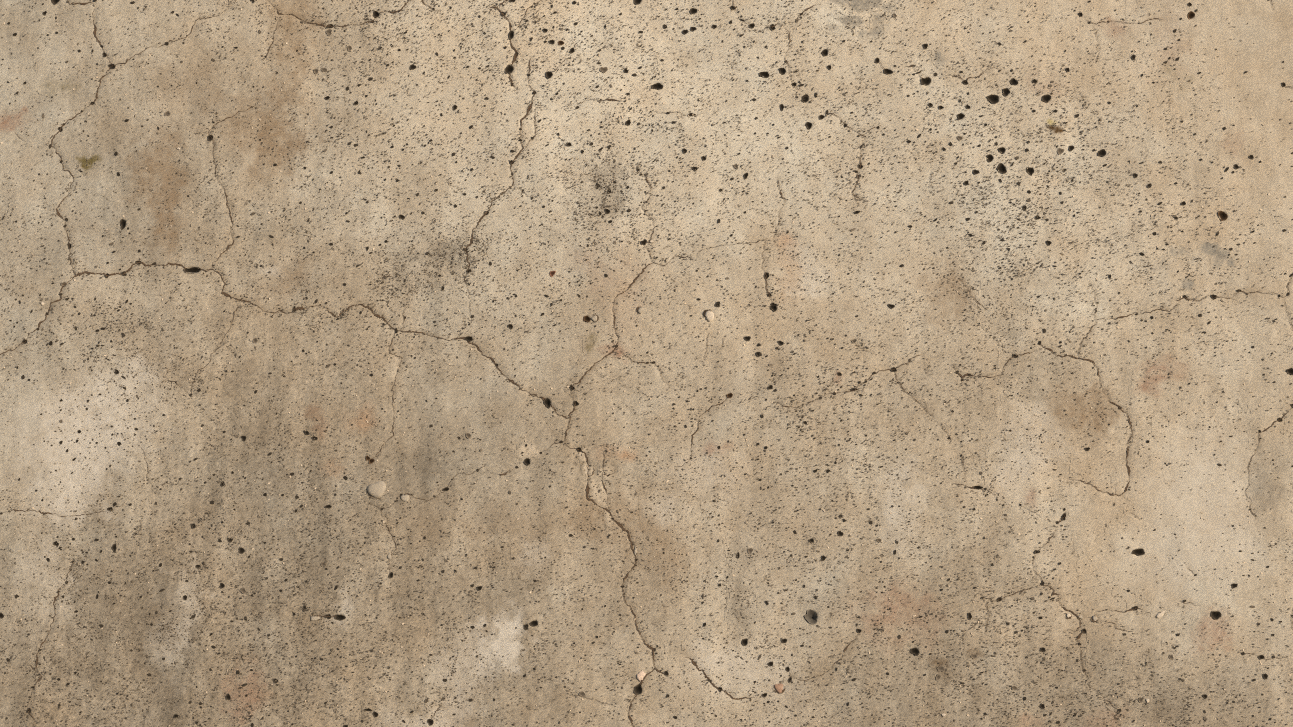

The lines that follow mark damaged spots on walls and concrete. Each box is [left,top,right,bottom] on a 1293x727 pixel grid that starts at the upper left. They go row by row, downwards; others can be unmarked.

crack [733,1,817,90]
crack [1081,15,1163,63]
crack [824,113,879,200]
crack [0,0,786,727]
crack [775,345,948,433]
crack [958,277,1293,519]
crack [954,464,1140,720]